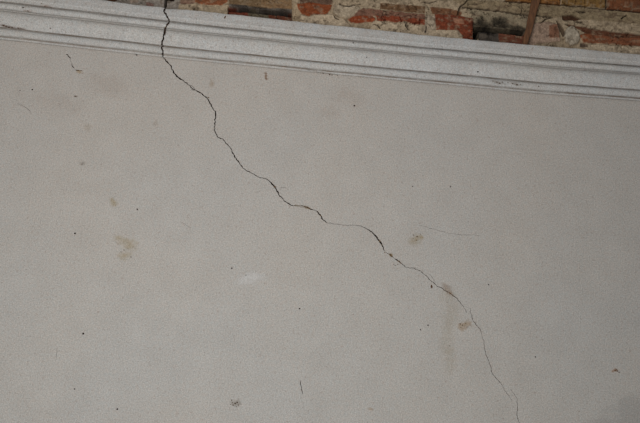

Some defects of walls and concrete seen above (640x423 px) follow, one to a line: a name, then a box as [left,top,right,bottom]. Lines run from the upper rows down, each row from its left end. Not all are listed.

crack [161,9,519,421]